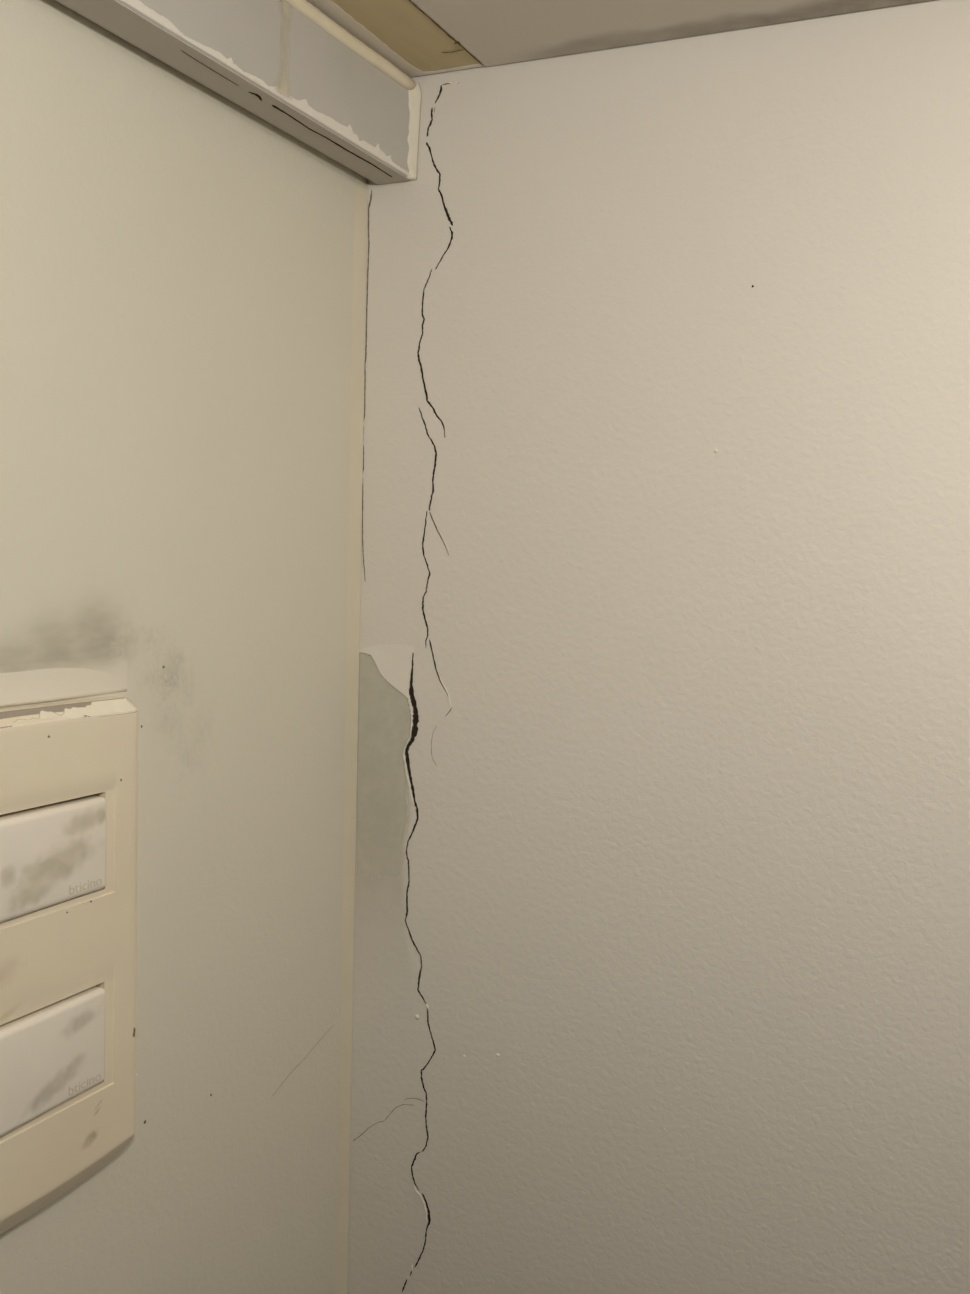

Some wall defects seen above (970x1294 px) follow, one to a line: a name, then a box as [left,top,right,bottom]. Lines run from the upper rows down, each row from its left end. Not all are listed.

peeling [121,0,410,176]
crack [181,50,392,578]
peeling [357,644,414,843]
crack [353,82,459,1292]